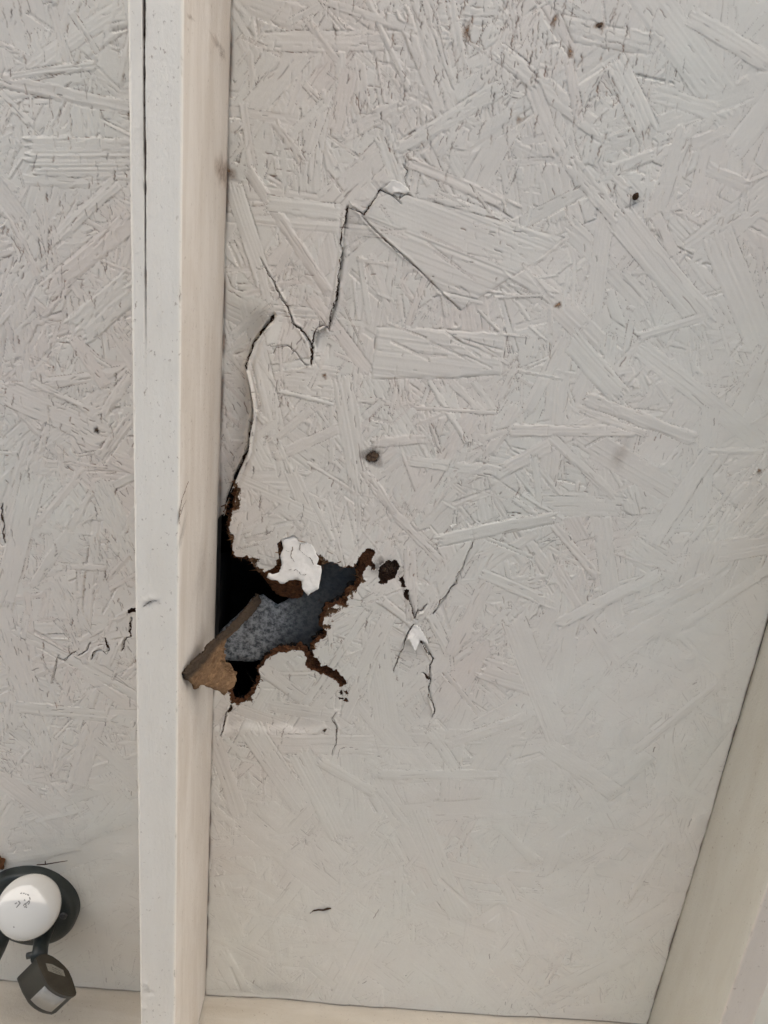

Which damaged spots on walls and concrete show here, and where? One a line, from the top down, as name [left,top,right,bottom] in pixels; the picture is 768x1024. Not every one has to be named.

crack [245,165,458,369]
crack [235,419,254,474]
peeling [221,467,328,595]
spalling [227,555,362,704]
crack [393,542,473,717]